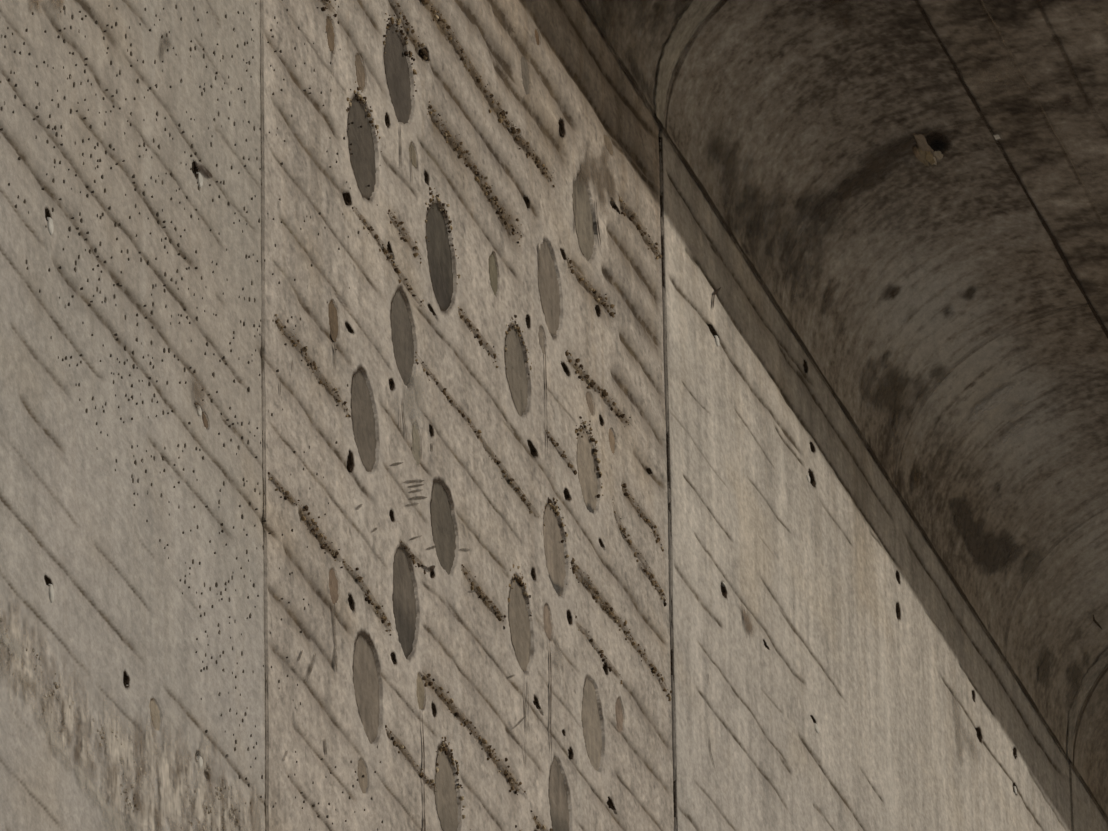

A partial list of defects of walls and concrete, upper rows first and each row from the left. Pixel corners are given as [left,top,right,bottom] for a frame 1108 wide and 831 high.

spalling [912,133,951,166]
water stain [953,499,1021,574]